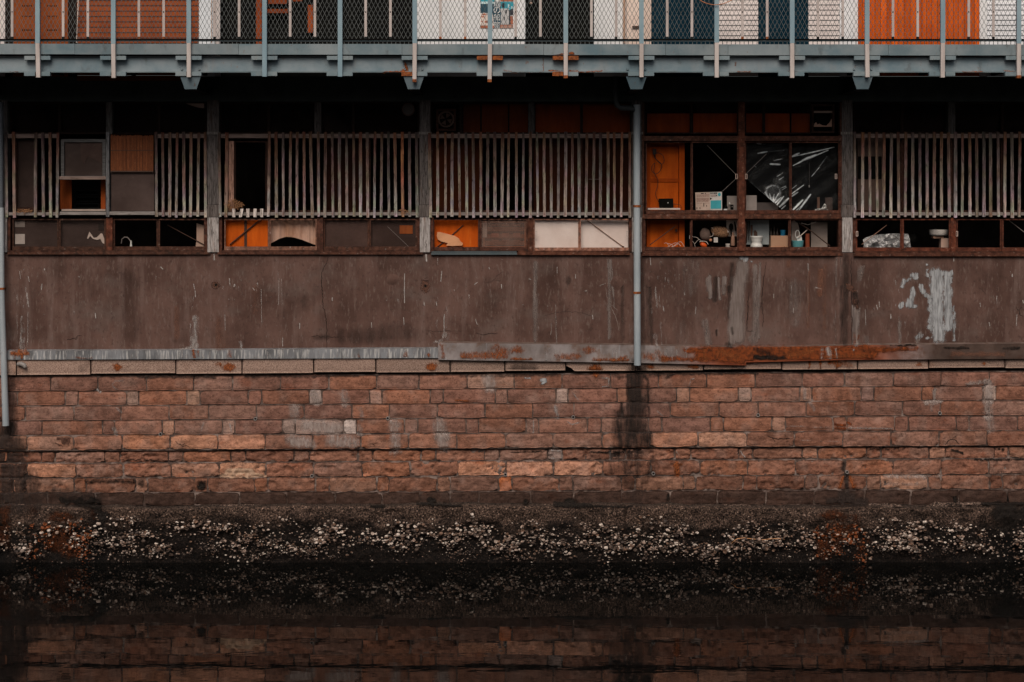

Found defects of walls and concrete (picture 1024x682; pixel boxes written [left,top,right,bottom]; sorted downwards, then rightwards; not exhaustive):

peeling [898,264,956,343]
corrosion [460,344,532,360]
corrosion [557,346,629,378]
damp [602,275,859,479]
corrosion [644,335,922,370]